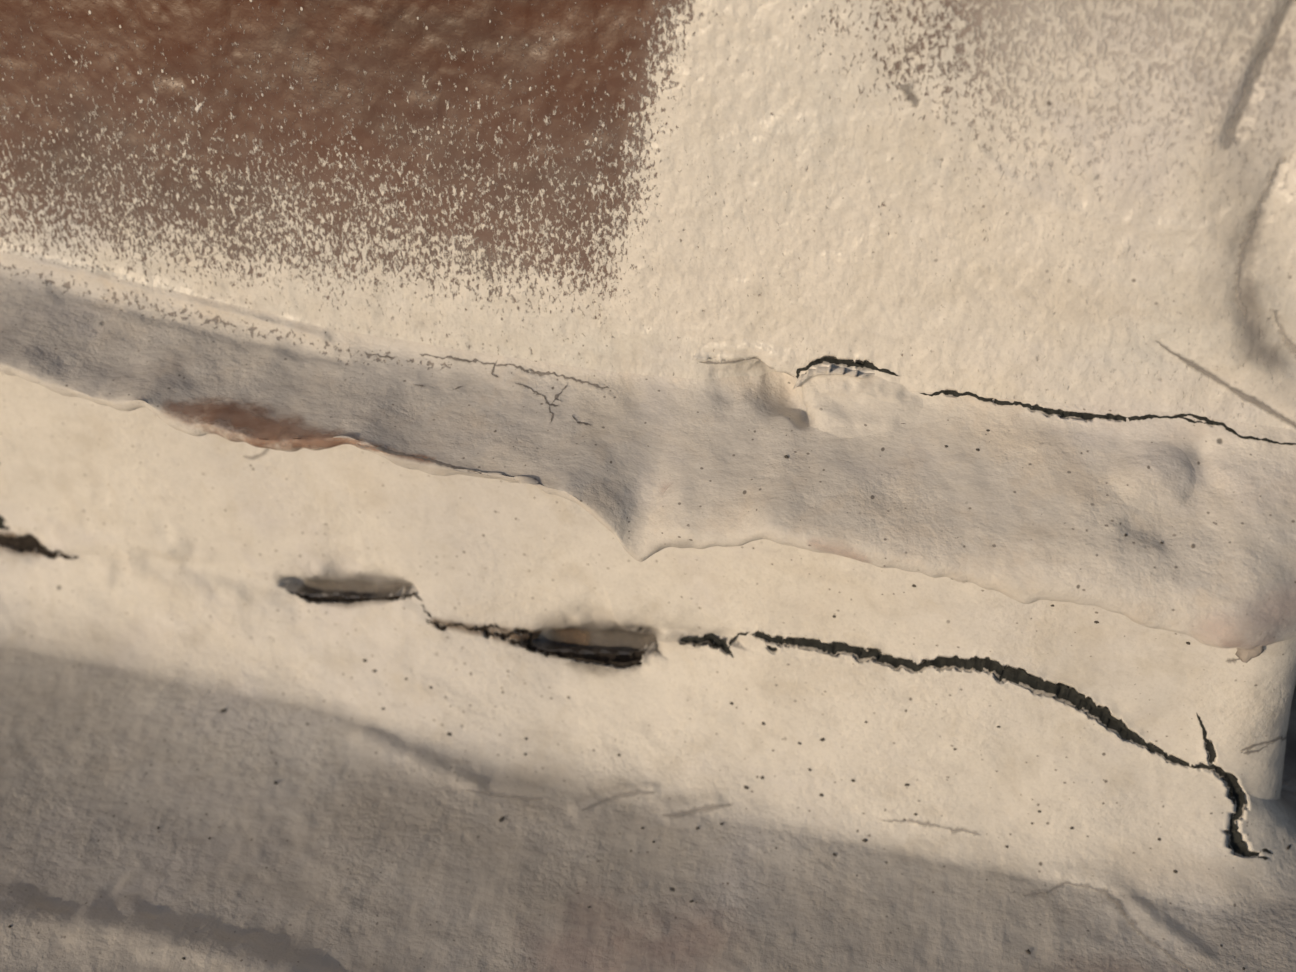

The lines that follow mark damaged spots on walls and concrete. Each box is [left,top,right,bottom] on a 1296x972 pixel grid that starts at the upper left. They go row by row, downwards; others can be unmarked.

crack [701,356,1296,445]
rust [168,403,383,452]
crack [0,534,79,560]
crack [422,605,553,656]
peeling [640,632,678,670]
crack [680,632,1287,860]